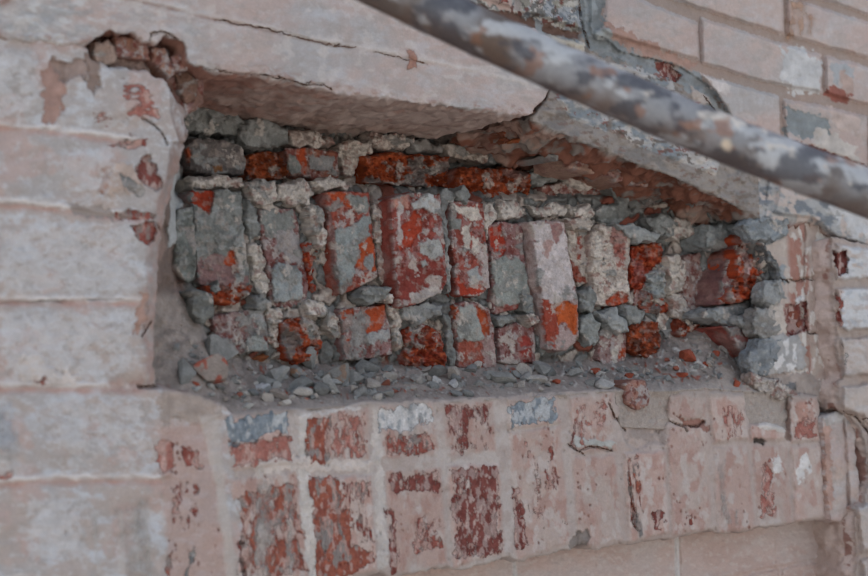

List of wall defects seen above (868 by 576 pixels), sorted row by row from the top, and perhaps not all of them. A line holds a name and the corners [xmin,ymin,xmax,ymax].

spalling [85,35,817,576]